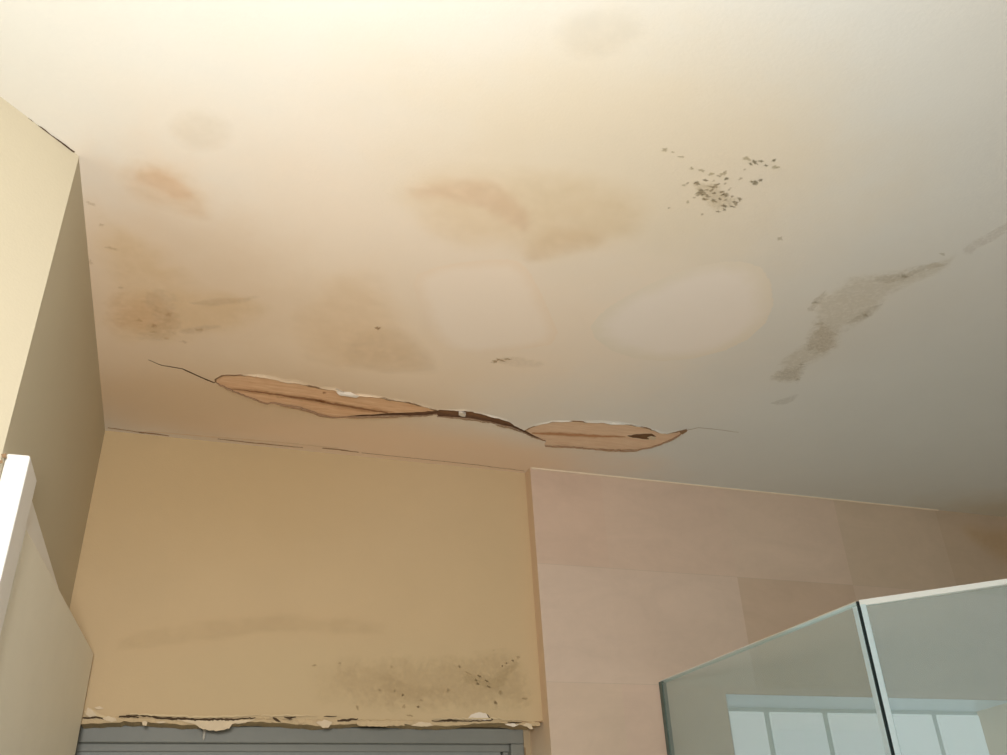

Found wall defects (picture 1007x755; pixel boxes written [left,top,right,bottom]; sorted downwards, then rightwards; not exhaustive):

crack [149,360,214,383]
peeling [210,373,439,420]
crack [355,408,544,443]
peeling [524,419,691,453]
peeling [81,706,542,731]